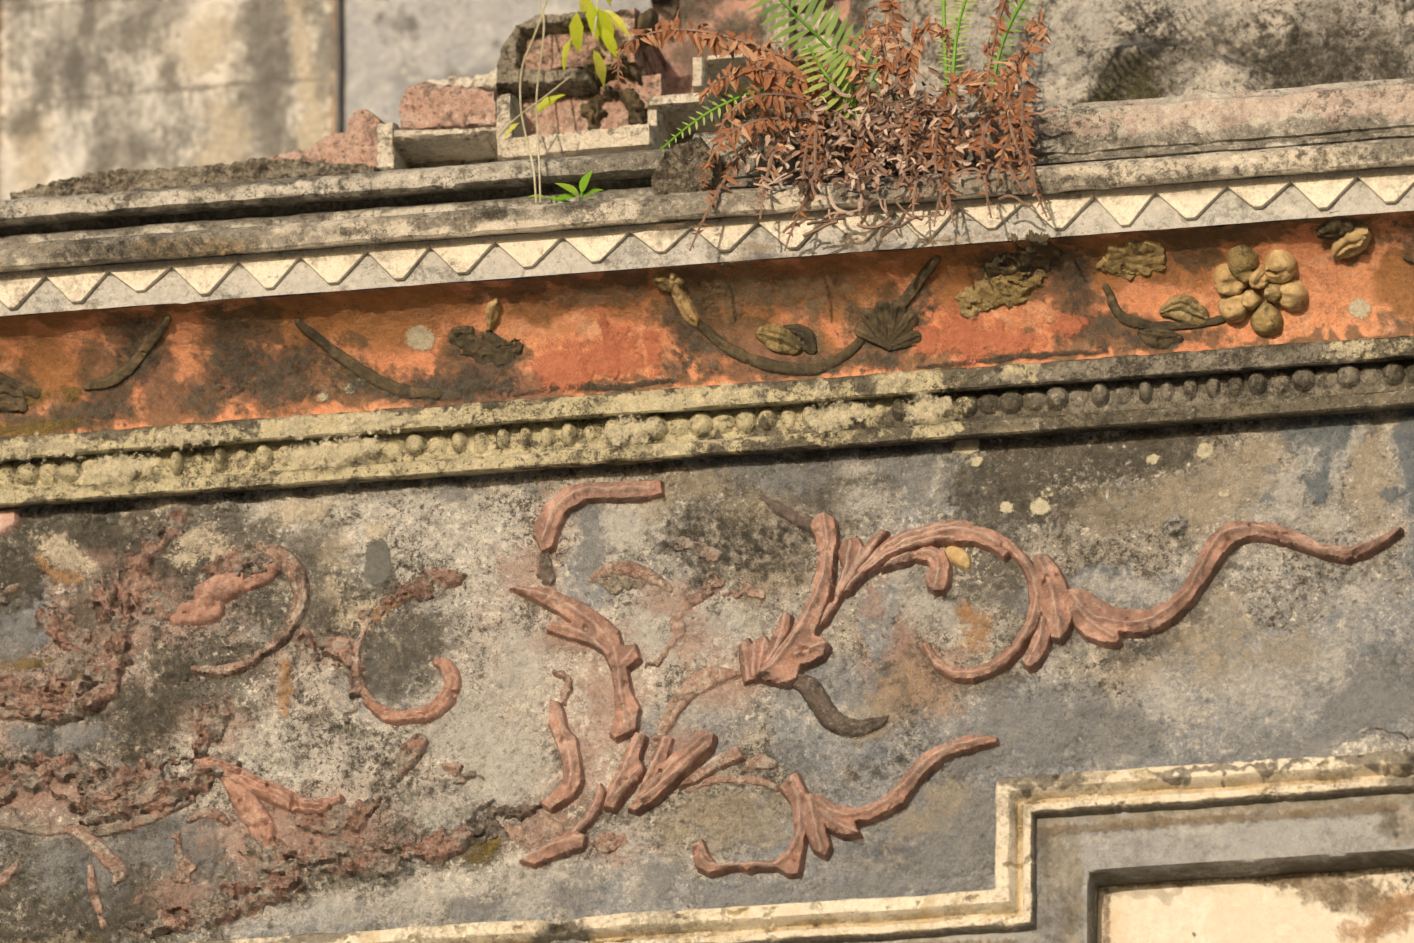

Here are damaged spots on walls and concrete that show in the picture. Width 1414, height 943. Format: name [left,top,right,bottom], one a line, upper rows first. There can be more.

water stain [2,0,337,190]
spalling [496,11,598,108]
water stain [966,1,1003,70]
water stain [1158,0,1411,87]
spalling [0,507,101,585]
spalling [121,494,468,779]
spalling [552,669,573,706]
spalling [1,720,110,757]
spalling [441,763,486,786]
spalling [26,835,131,920]
spalling [112,814,225,884]